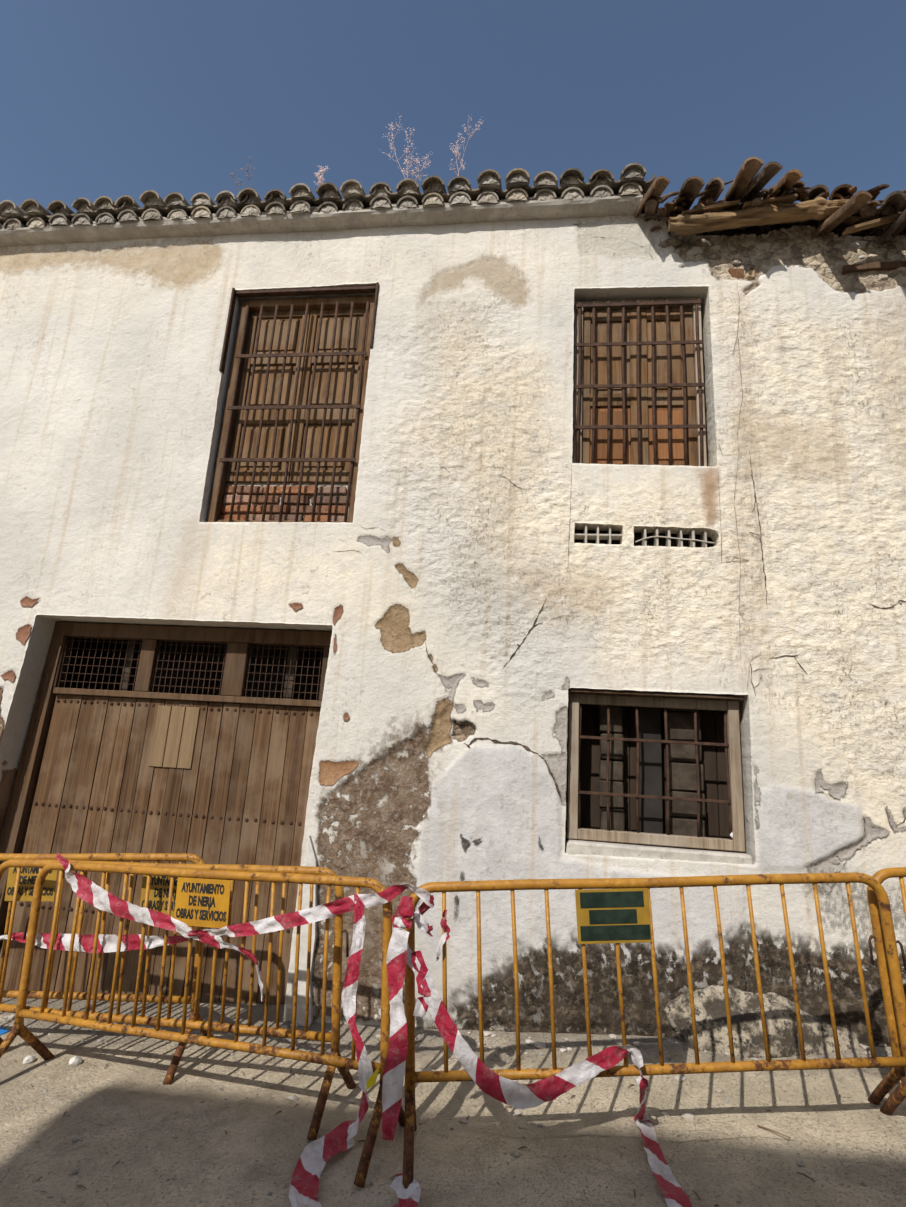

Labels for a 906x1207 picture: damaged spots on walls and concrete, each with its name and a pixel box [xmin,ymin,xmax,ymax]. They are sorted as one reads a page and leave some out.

spalling [577,215,906,295]
crack [718,286,808,696]
peeling [356,534,418,588]
peeling [16,624,31,645]
peeling [20,596,40,607]
crack [503,599,576,668]
peeling [0,670,15,738]
crack [464,738,561,798]
peeling [541,677,570,805]
spalling [296,603,495,1026]
peeling [807,806,906,894]
water stain [449,924,891,1047]